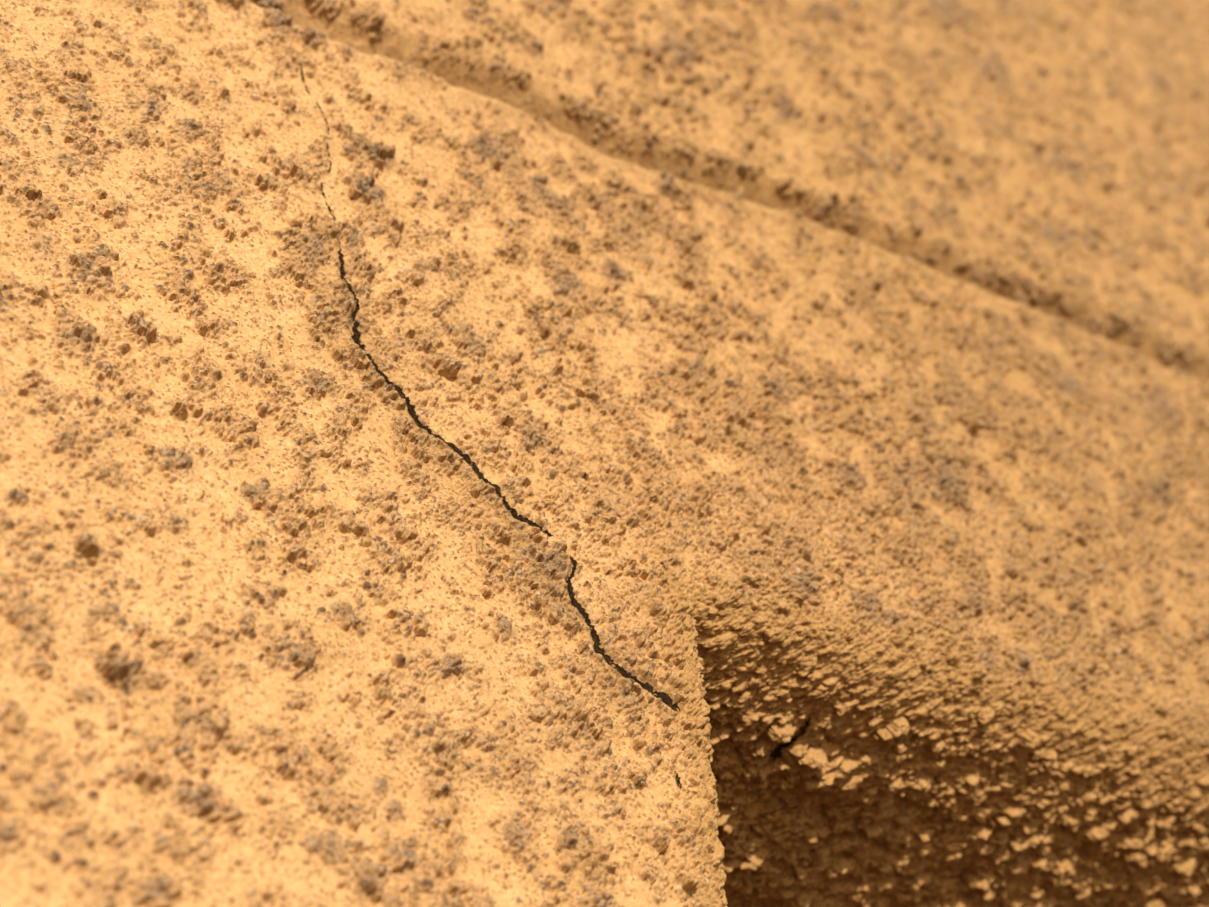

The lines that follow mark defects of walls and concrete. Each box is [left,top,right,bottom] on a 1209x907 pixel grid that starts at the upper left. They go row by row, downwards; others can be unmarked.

crack [297,58,680,711]